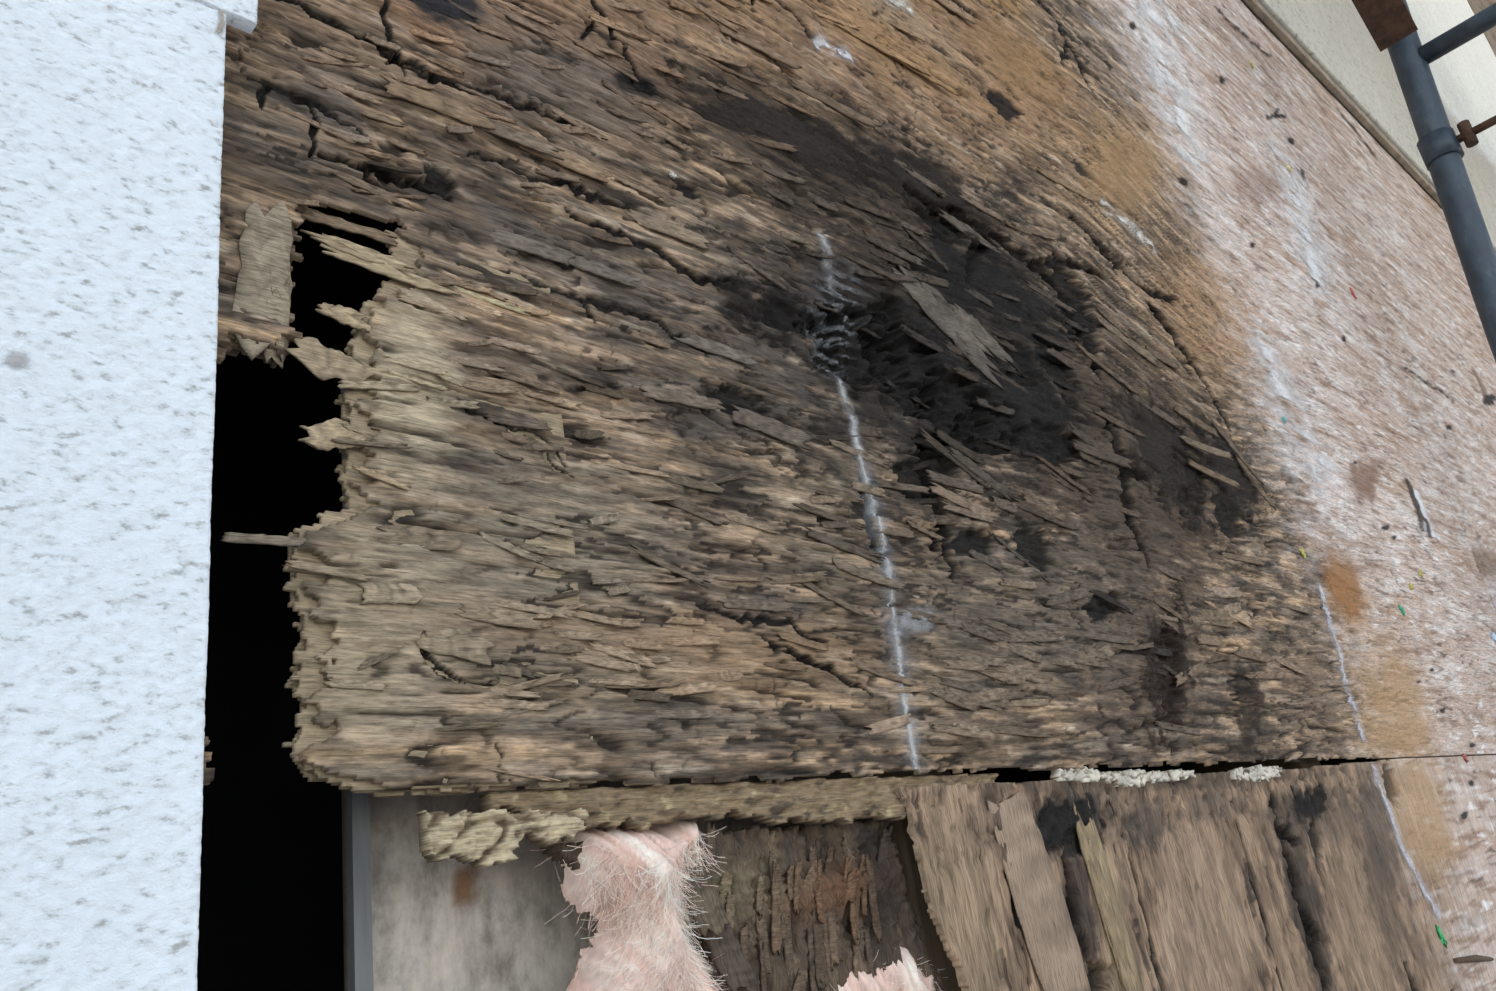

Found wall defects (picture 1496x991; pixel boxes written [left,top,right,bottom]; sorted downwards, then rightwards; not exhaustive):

crack [216,10,225,34]
crack [275,0,573,126]
damp [412,0,477,30]
crack [247,78,450,202]
crack [467,152,726,287]
damp [1101,200,1154,247]
damp [615,59,1096,579]
crack [1103,419,1141,551]
damp [1110,387,1266,544]
rust [1326,557,1359,617]
damp [894,609,930,756]
spalling [479,766,1091,991]